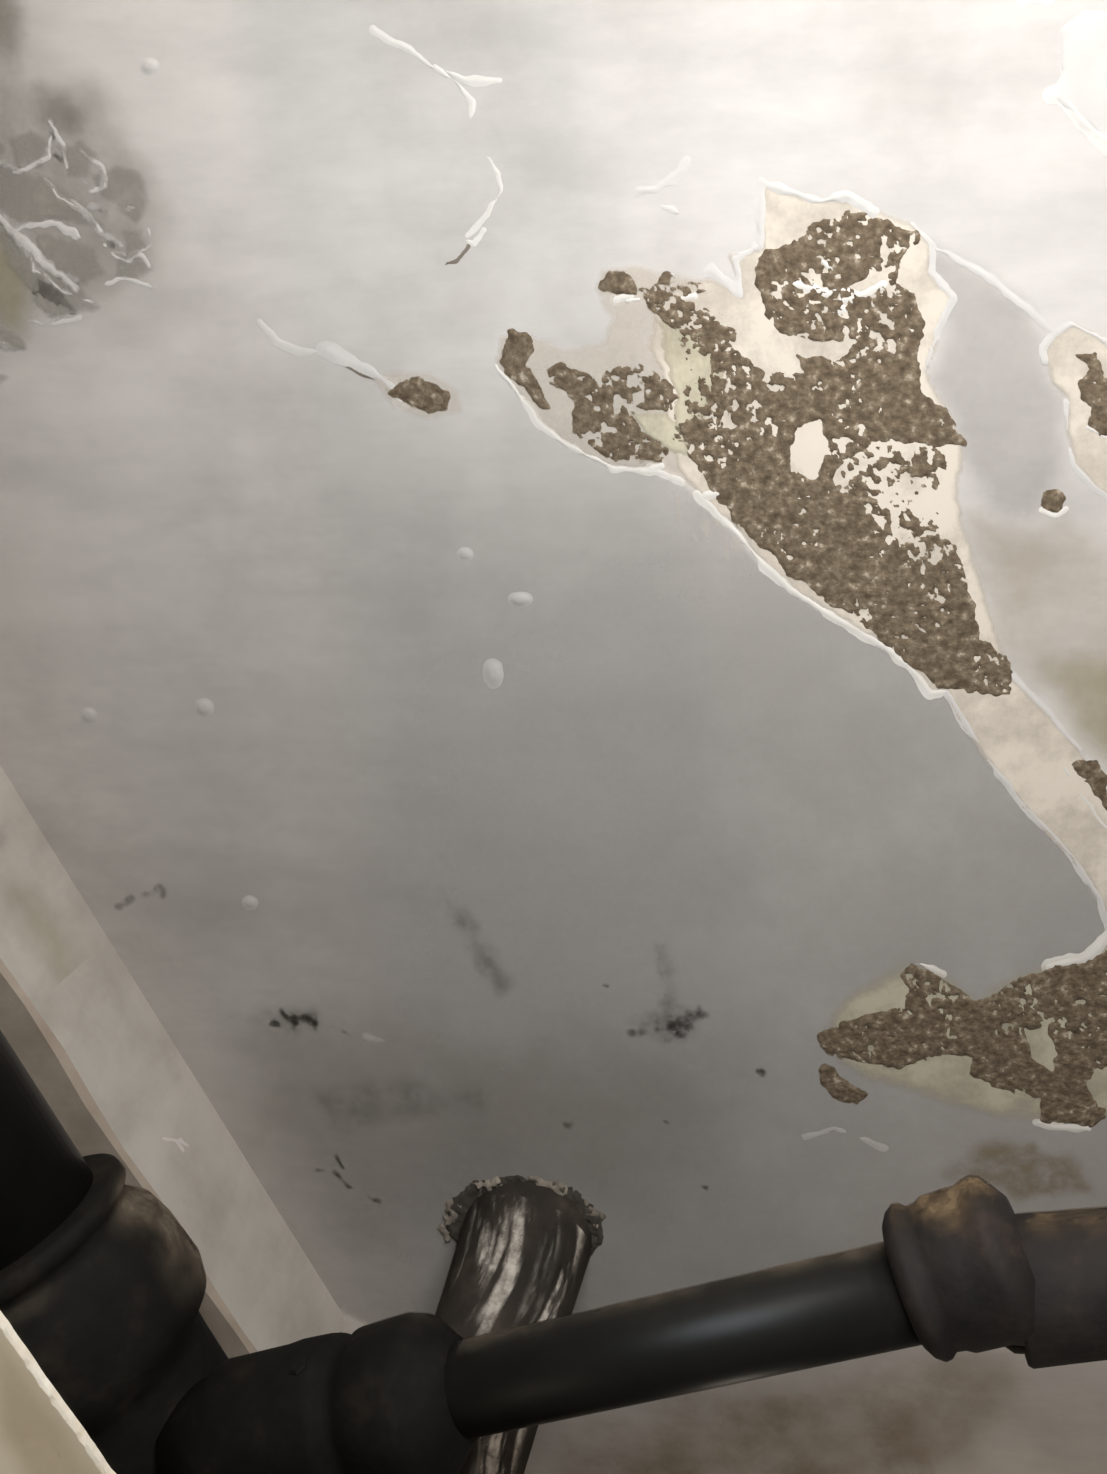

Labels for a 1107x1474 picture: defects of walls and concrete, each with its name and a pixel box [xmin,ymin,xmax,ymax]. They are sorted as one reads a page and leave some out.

crack [369,25,502,118]
crack [445,156,503,265]
peeling [257,319,451,414]
peeling [494,177,1107,1133]